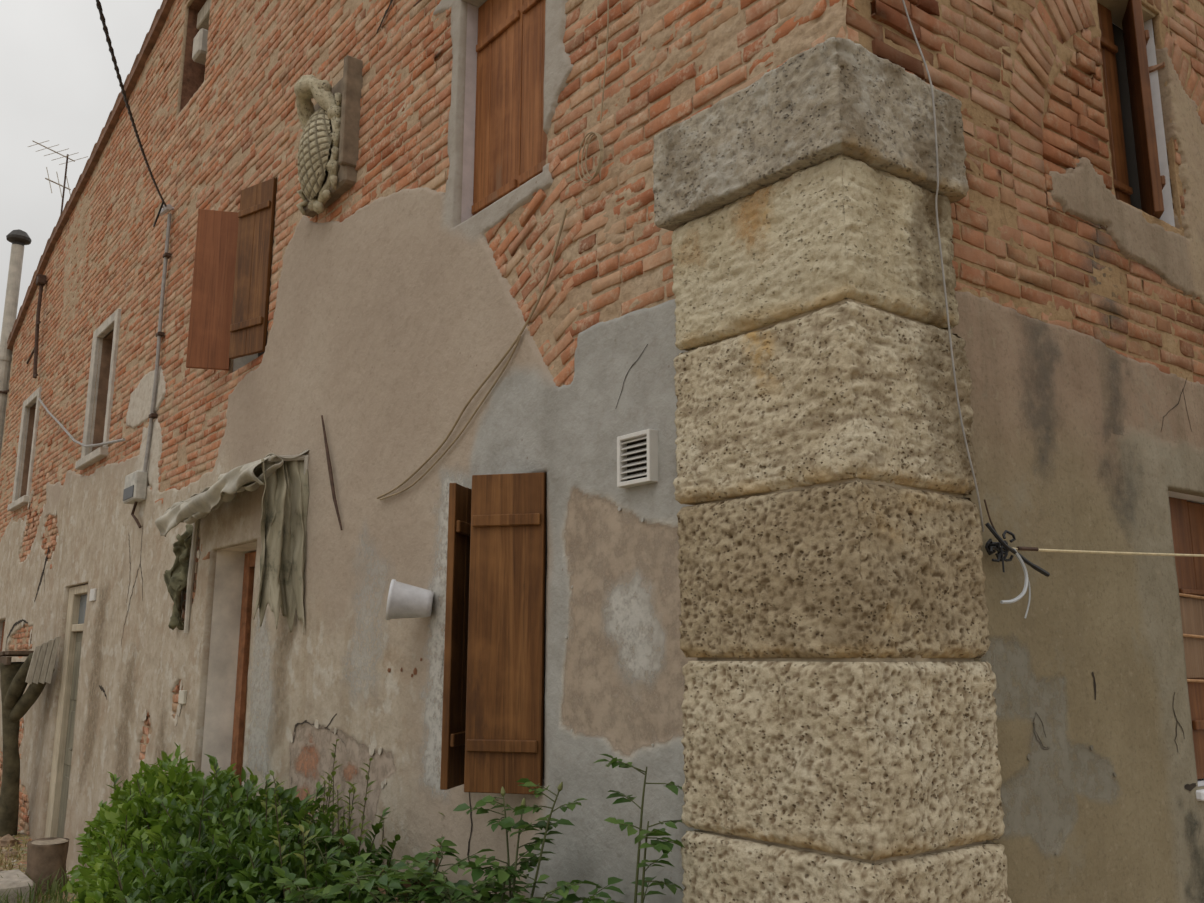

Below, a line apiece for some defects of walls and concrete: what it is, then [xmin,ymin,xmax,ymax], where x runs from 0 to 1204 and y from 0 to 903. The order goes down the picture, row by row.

spalling [19,458,59,569]
peeling [562,489,697,755]
spalling [18,780,30,835]
peeling [289,720,395,848]